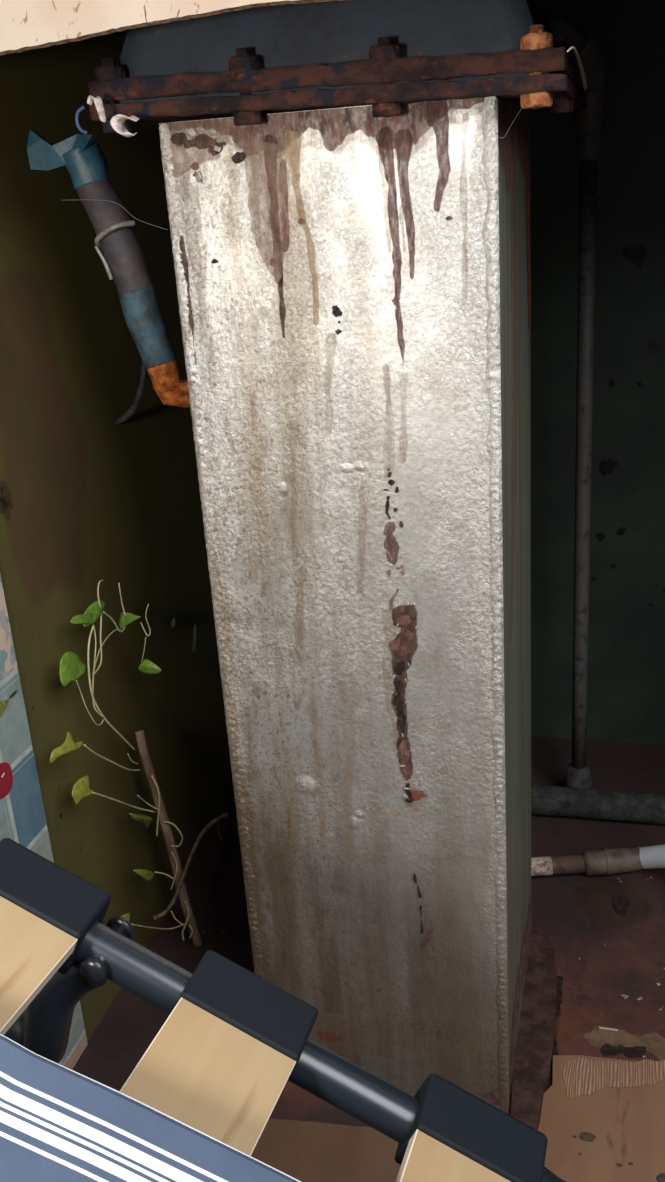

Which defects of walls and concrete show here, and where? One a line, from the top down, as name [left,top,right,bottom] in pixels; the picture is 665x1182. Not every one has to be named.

rust [159,96,531,365]